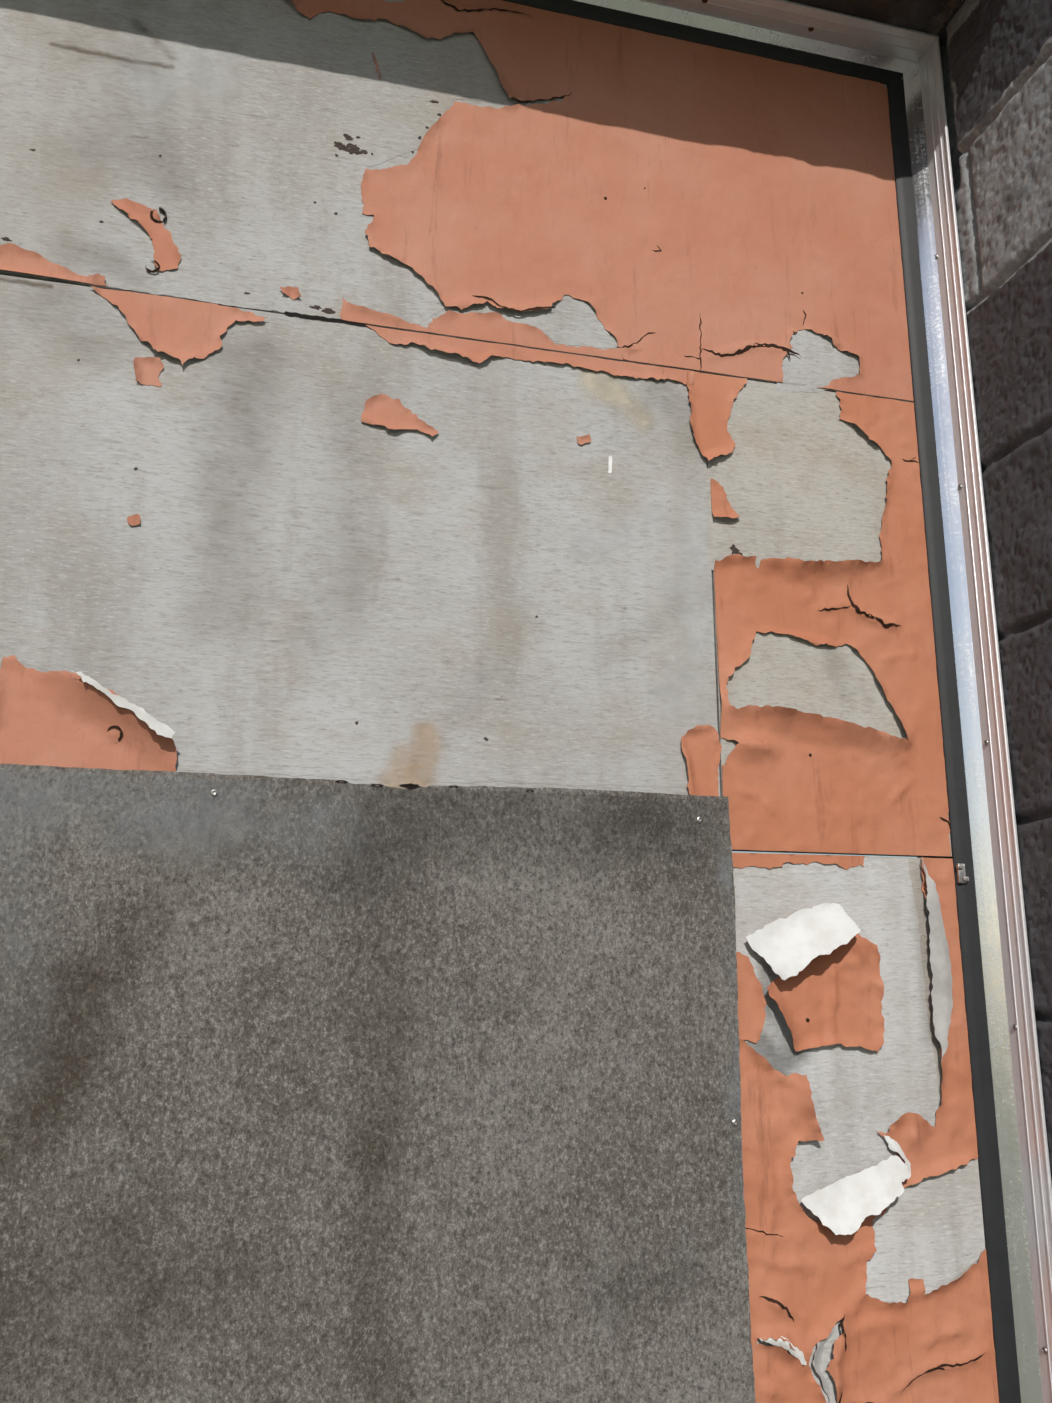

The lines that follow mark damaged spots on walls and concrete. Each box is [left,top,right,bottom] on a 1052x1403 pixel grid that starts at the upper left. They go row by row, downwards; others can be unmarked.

crack [472,295,556,313]
crack [686,310,806,371]
peeling [0,0,902,796]
crack [819,585,901,628]
peeling [732,853,985,1303]
crack [759,1296,794,1321]
crack [839,1316,847,1351]
peeling [759,1319,843,1403]
crack [838,1352,987,1403]